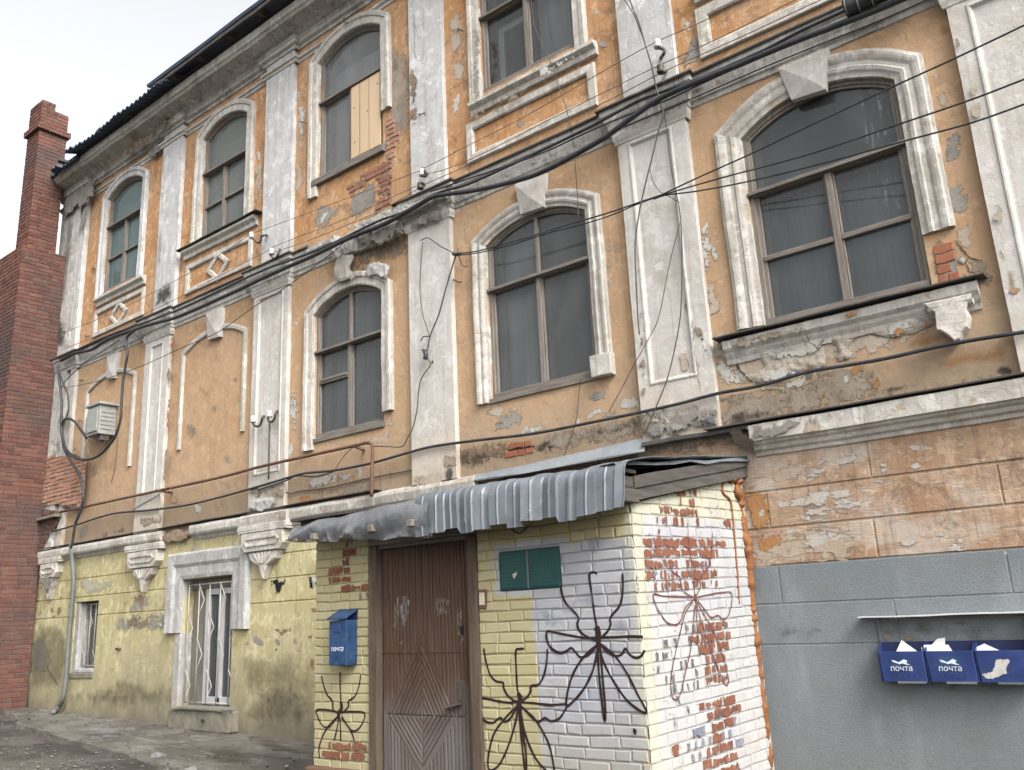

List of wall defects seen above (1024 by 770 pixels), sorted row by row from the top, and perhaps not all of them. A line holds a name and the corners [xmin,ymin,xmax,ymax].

flaking render [347,47,417,214]
peeling [945,133,961,162]
peeling [949,181,969,213]
peeling [700,223,720,315]
flaking render [414,327,965,486]
peeling [744,453,862,567]
peeling [116,595,164,633]